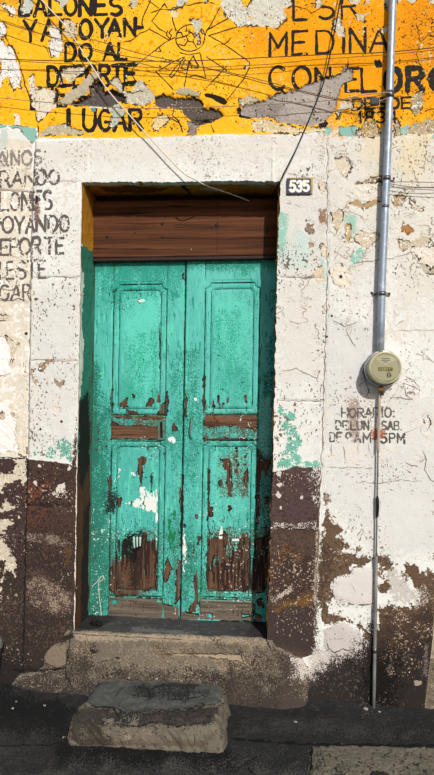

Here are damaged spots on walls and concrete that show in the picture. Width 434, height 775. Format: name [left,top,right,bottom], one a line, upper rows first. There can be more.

peeling [220,0,293,30]
peeling [331,17,345,38]
peeling [348,0,370,22]
spalling [238,66,434,343]
peeling [0,402,41,610]
peeling [110,388,178,440]
peeling [136,456,153,506]
peeling [107,474,271,622]
peeling [195,375,282,526]
crack [259,141,434,653]
spalling [313,492,434,644]